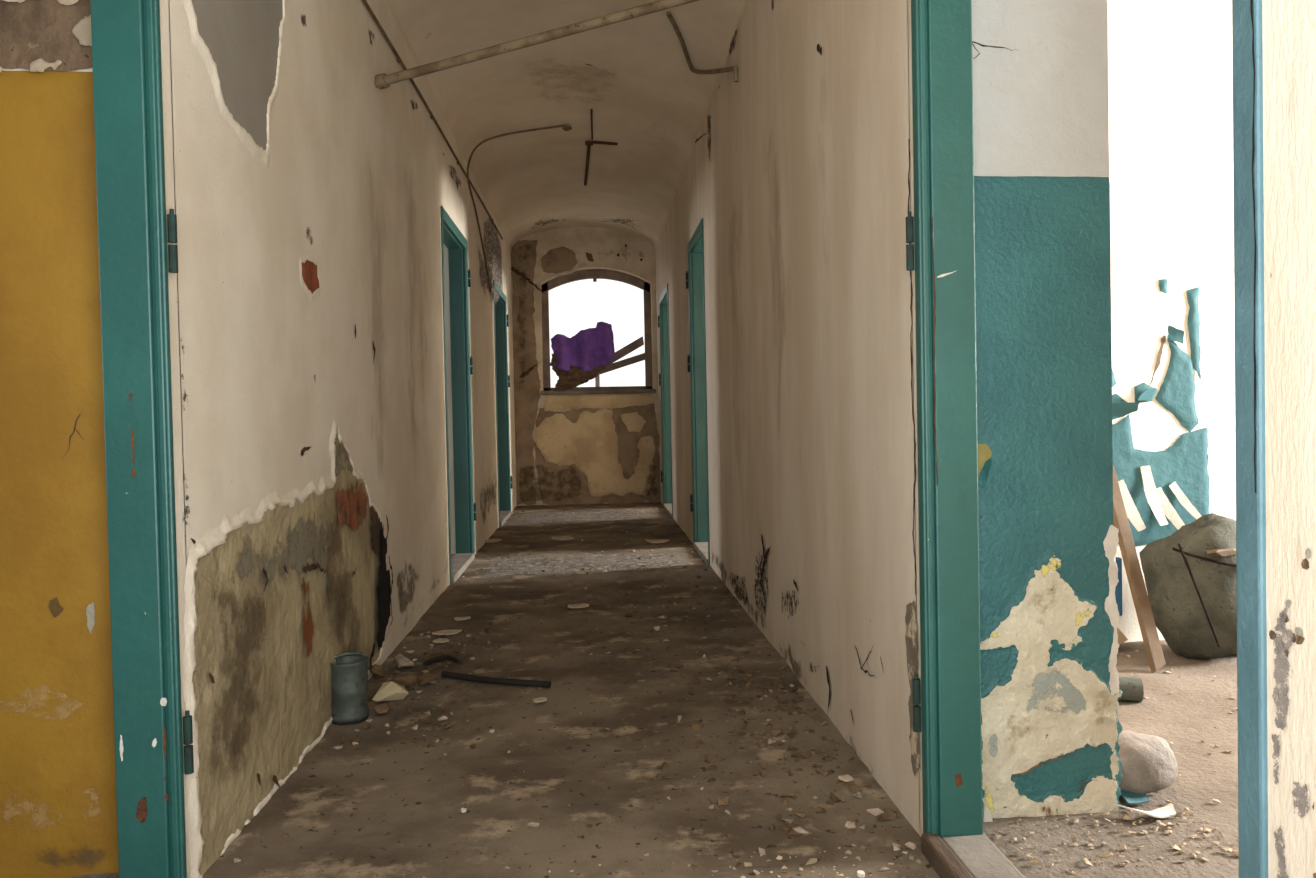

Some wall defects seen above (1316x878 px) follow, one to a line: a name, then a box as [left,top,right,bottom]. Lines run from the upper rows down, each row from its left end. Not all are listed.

flaking render [0,0,93,72]
peeling [183,0,286,171]
flaking render [299,254,321,301]
peeling [1159,279,1168,294]
flaking render [511,240,661,505]
flaking render [978,287,1210,818]
peeling [1301,548,1311,570]
peeling [48,597,63,618]
peeling [86,602,95,634]
peeling [1269,600,1309,819]
peeling [1274,826,1289,878]